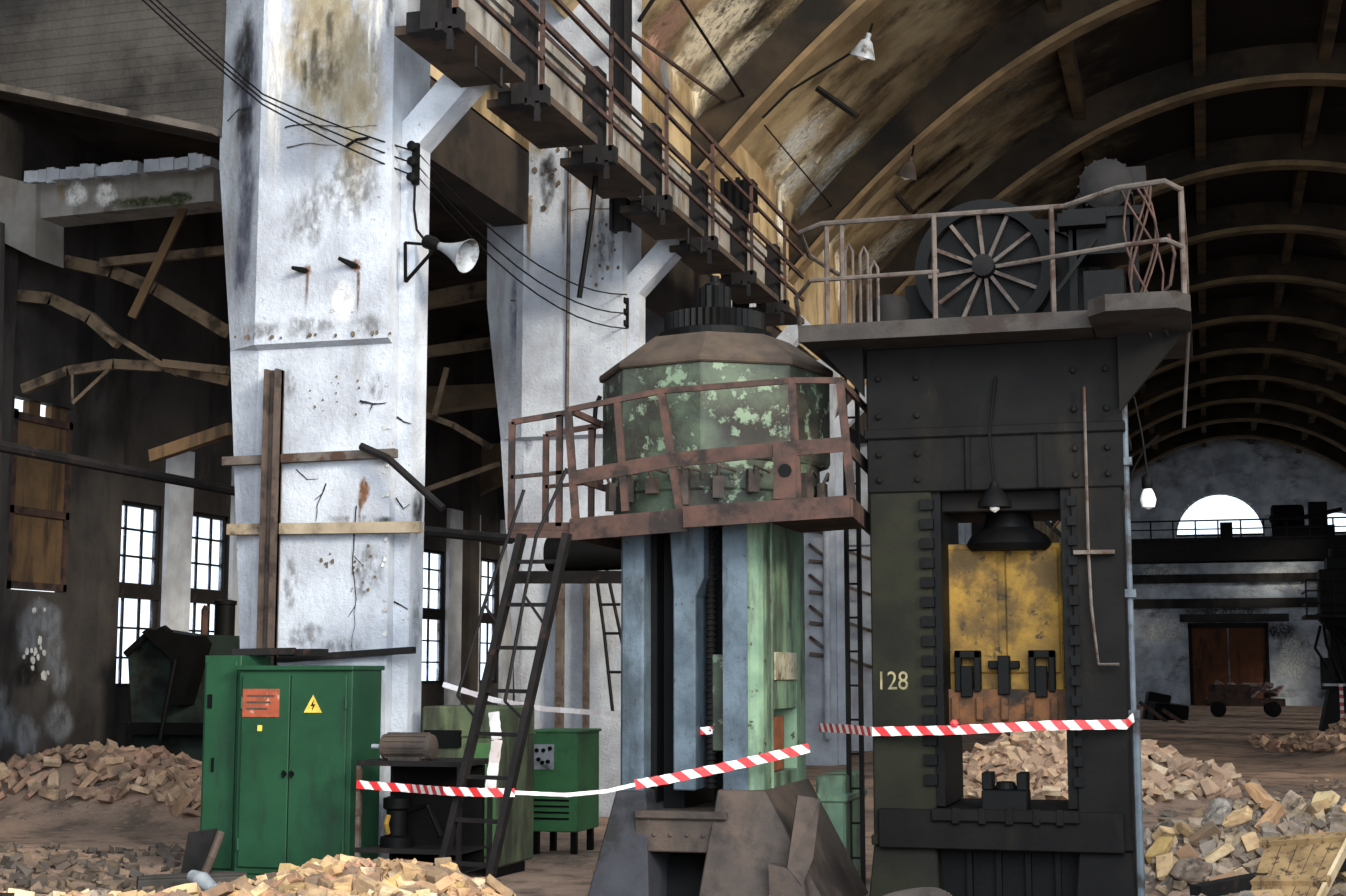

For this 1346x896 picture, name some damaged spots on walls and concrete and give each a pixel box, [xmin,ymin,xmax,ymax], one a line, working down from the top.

damp [716,0,782,58]
damp [234,0,392,287]
crack [296,469,326,519]
rust [359,479,369,516]
crack [348,506,363,646]